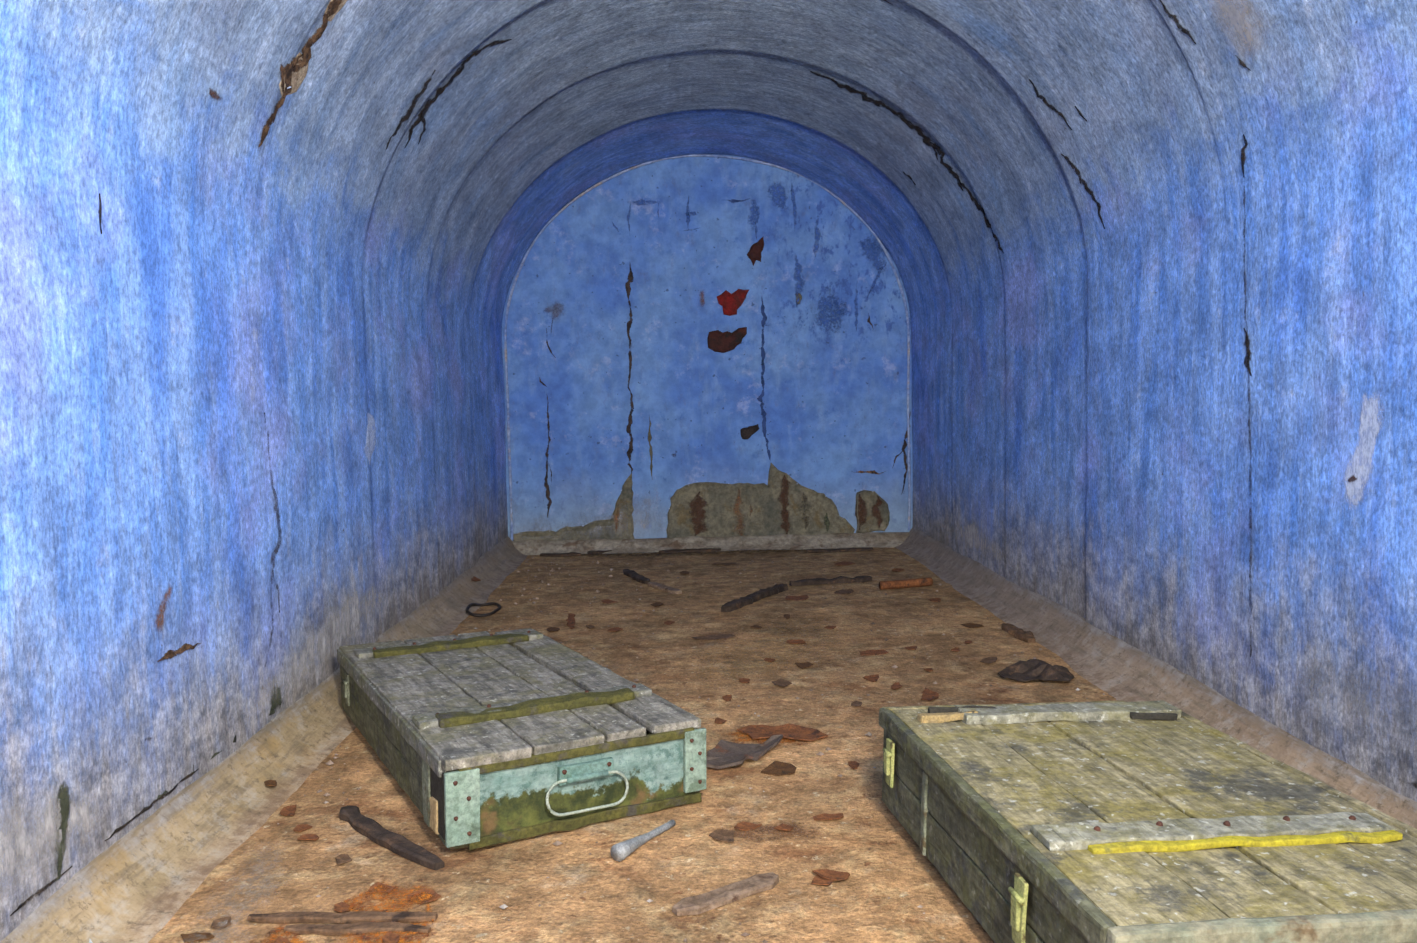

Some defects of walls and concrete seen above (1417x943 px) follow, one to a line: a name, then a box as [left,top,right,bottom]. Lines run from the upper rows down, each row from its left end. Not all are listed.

crack [258,0,342,147]
crack [625,265,653,480]
peeling [707,289,749,353]
peeling [747,237,764,266]
crack [757,297,771,459]
crack [1241,134,1252,656]
flaking render [666,463,890,538]
corrosion [156,588,172,629]